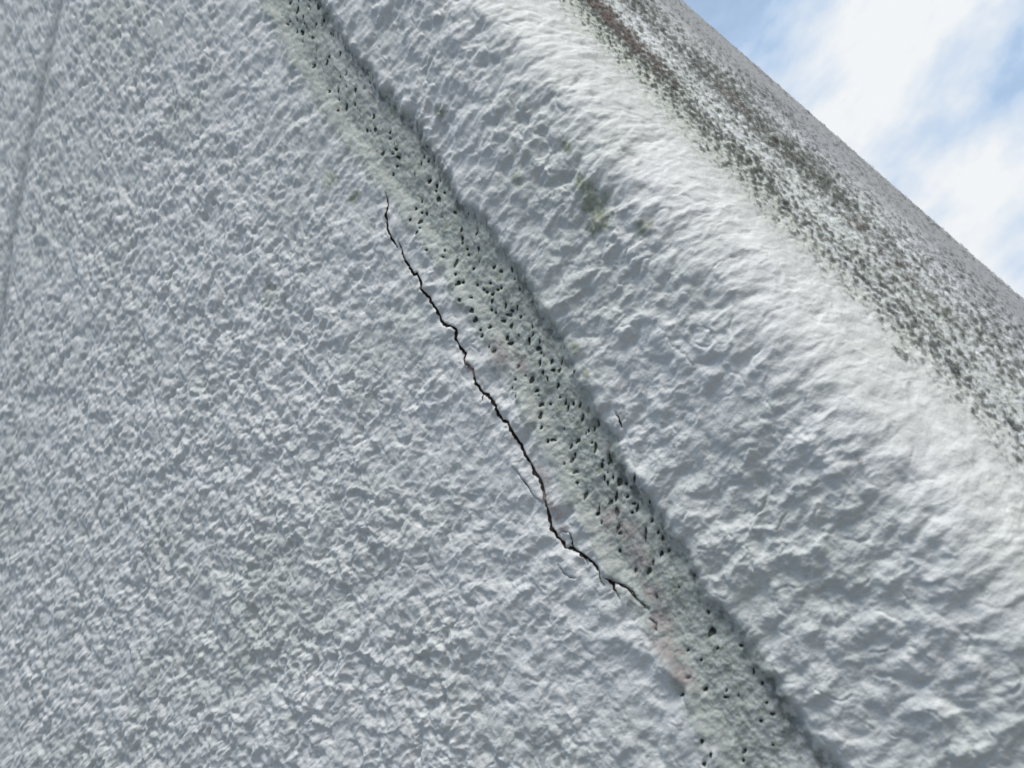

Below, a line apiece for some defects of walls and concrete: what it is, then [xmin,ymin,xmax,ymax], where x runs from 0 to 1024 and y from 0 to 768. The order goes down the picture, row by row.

crack [384,194,658,631]